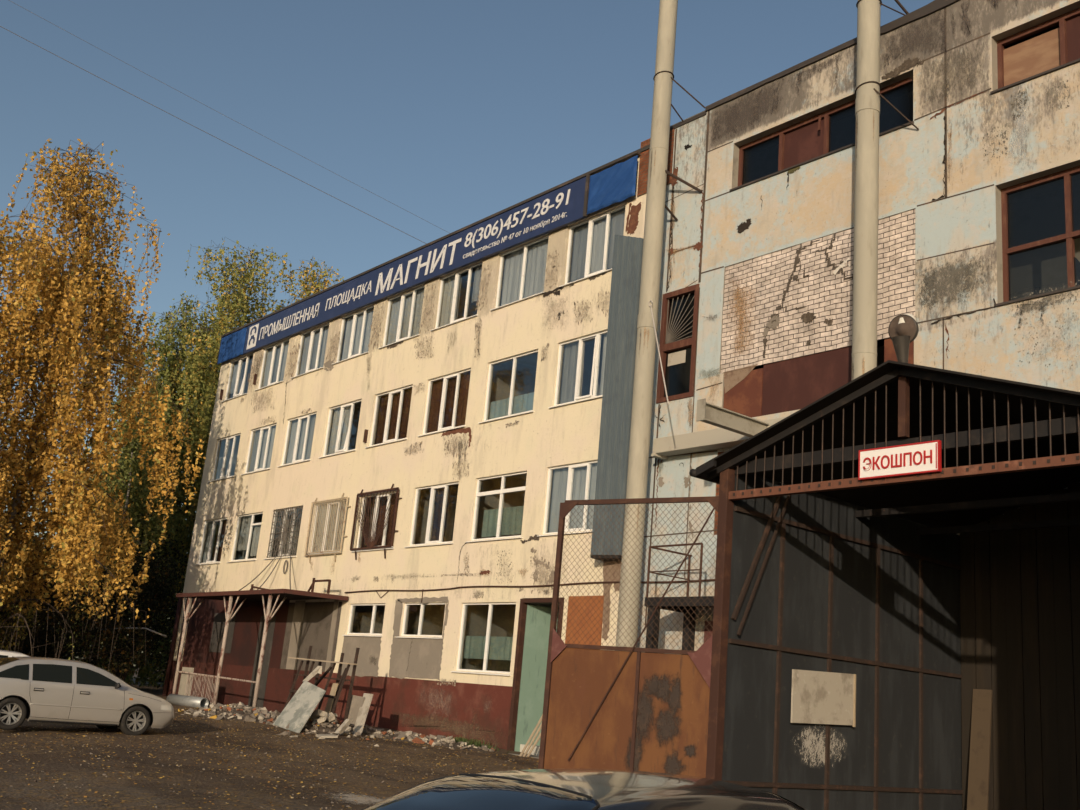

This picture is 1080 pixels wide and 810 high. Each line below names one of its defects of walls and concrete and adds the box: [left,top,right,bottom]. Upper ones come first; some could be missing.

water stain [886,3,975,99]
water stain [713,88,779,140]
flaking render [626,138,650,235]
flaking render [666,129,678,186]
spalling [737,218,752,234]
spalling [542,250,610,329]
crack [763,233,853,358]
water stain [920,257,992,310]
spalling [441,427,472,480]
peeling [441,534,555,594]